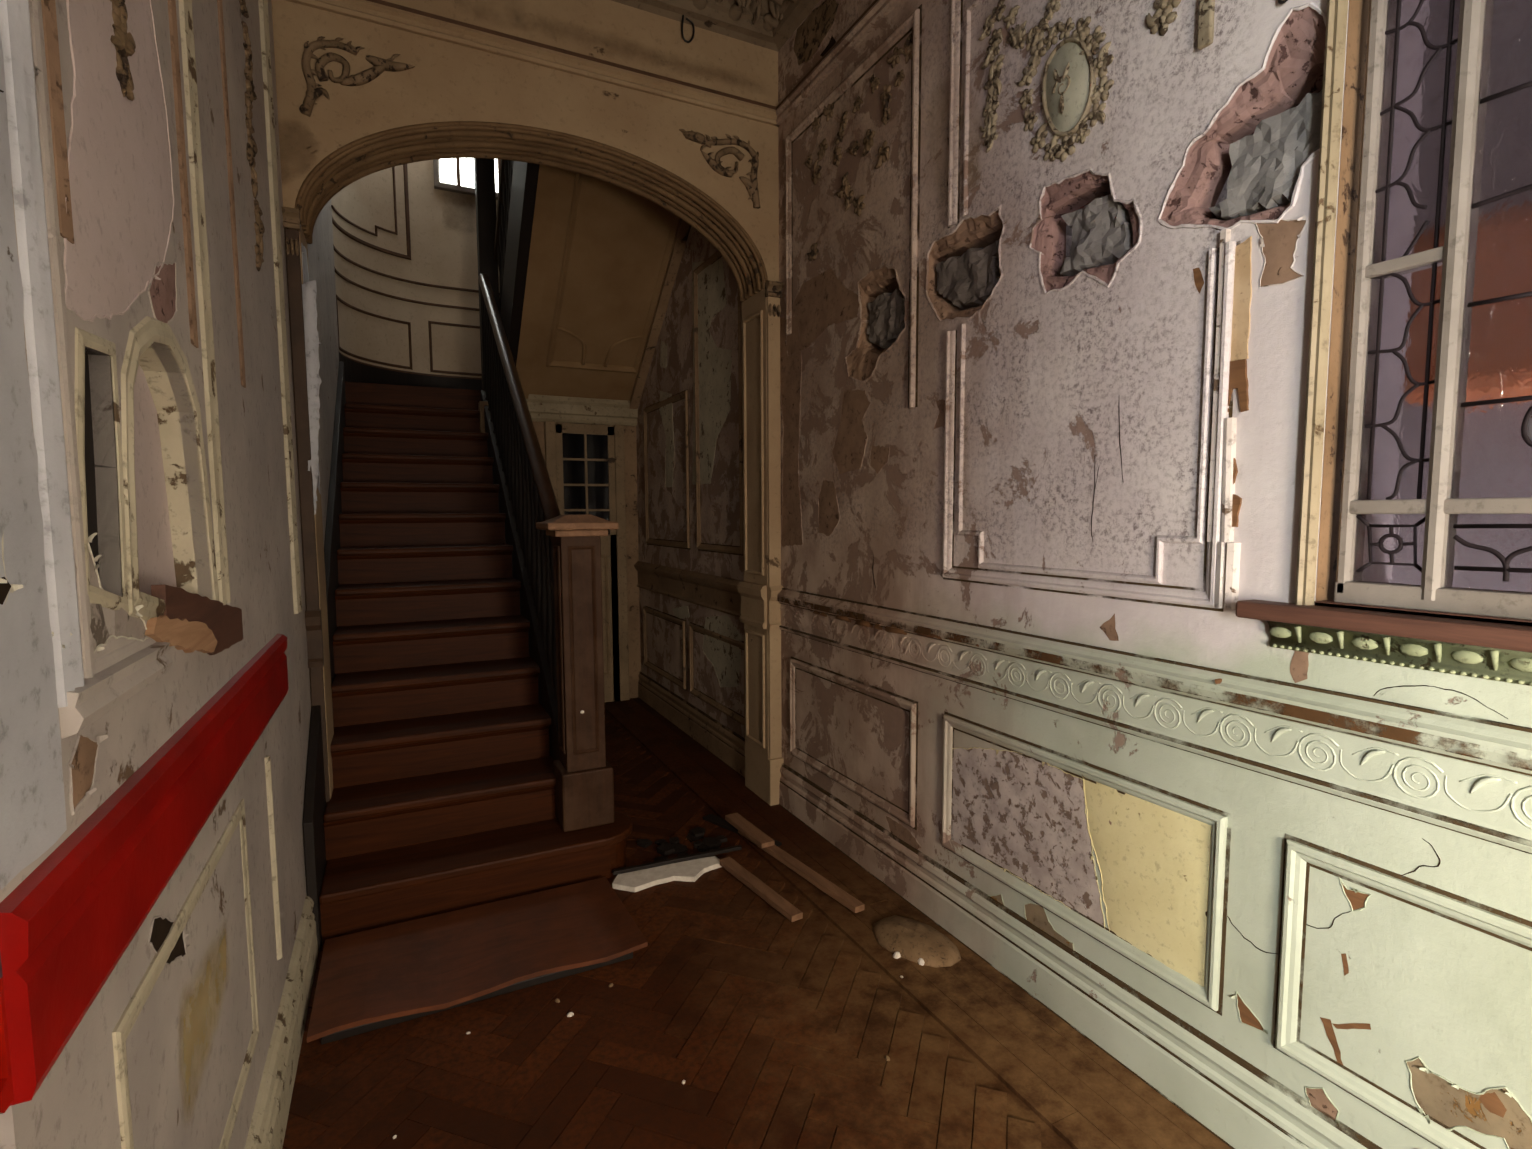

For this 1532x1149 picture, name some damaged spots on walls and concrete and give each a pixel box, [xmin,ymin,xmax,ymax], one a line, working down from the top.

spalling [1029,2,1327,295]
spalling [925,205,1005,322]
spalling [780,265,907,547]
peeling [933,399,945,430]
spalling [0,532,24,605]
peeling [1099,613,1119,641]
peeling [1290,651,1309,683]
peeling [951,747,1105,951]
peeling [1405,1057,1532,1149]